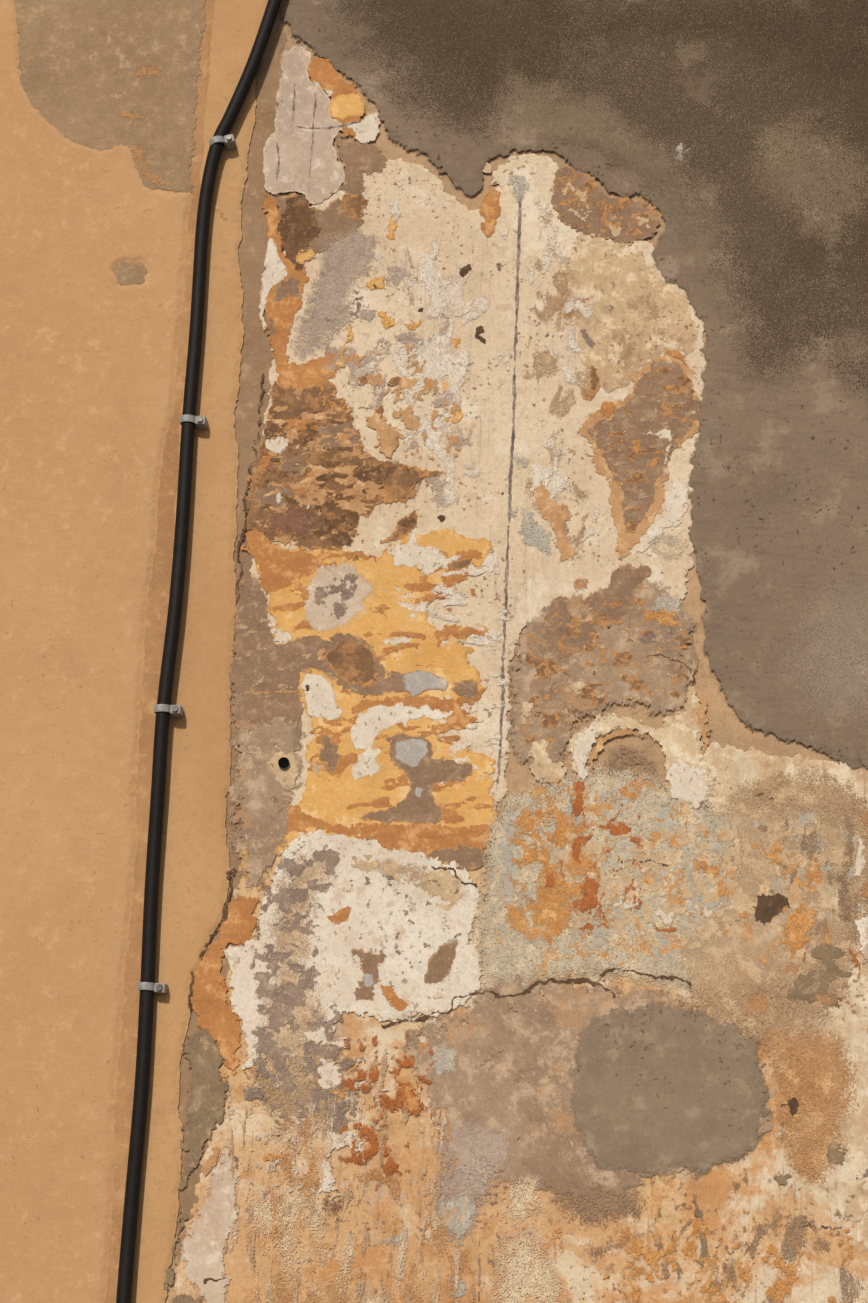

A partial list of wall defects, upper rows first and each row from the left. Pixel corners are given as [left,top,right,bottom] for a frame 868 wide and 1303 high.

flaking render [14,0,206,193]
peeling [163,46,868,1303]
crack [377,968,692,1028]